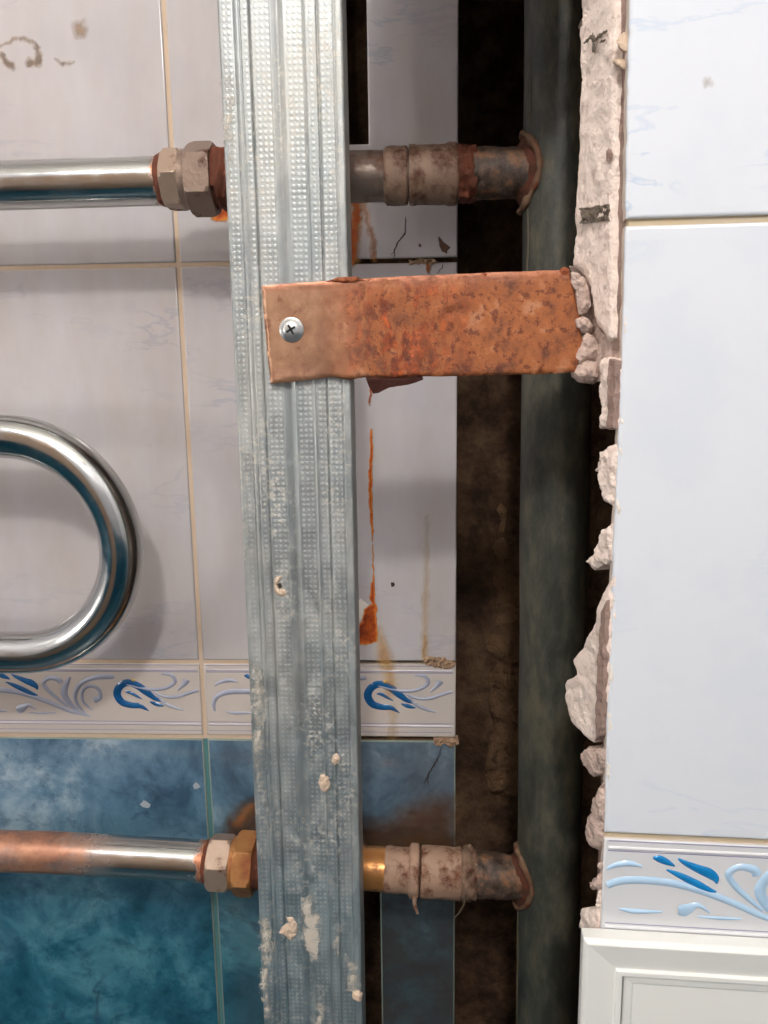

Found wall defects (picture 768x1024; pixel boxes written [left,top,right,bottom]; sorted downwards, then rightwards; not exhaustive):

flaking render [578,20,608,54]
rust [328,203,372,283]
spalling [579,204,610,224]
flaking render [569,266,626,430]
rust [359,429,378,645]
flaking render [565,444,622,928]